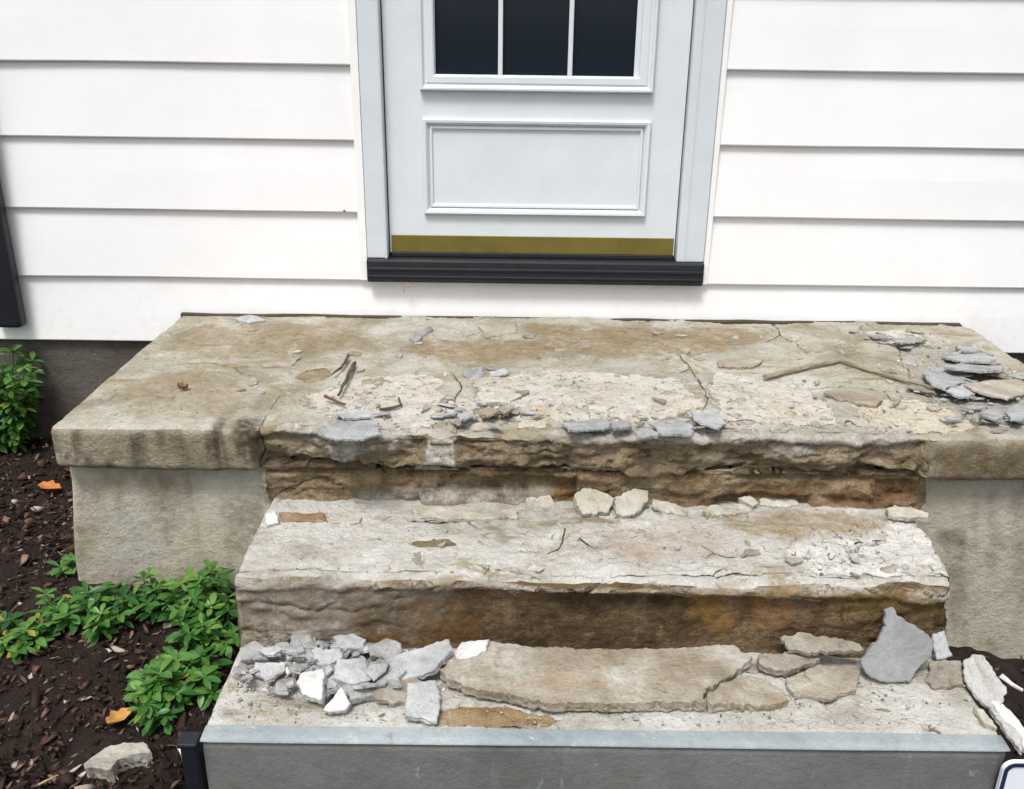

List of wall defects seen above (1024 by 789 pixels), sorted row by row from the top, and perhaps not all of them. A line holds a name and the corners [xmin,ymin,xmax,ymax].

spalling [257,329,1024,512]
crack [661,355,709,409]
spalling [0,435,948,789]